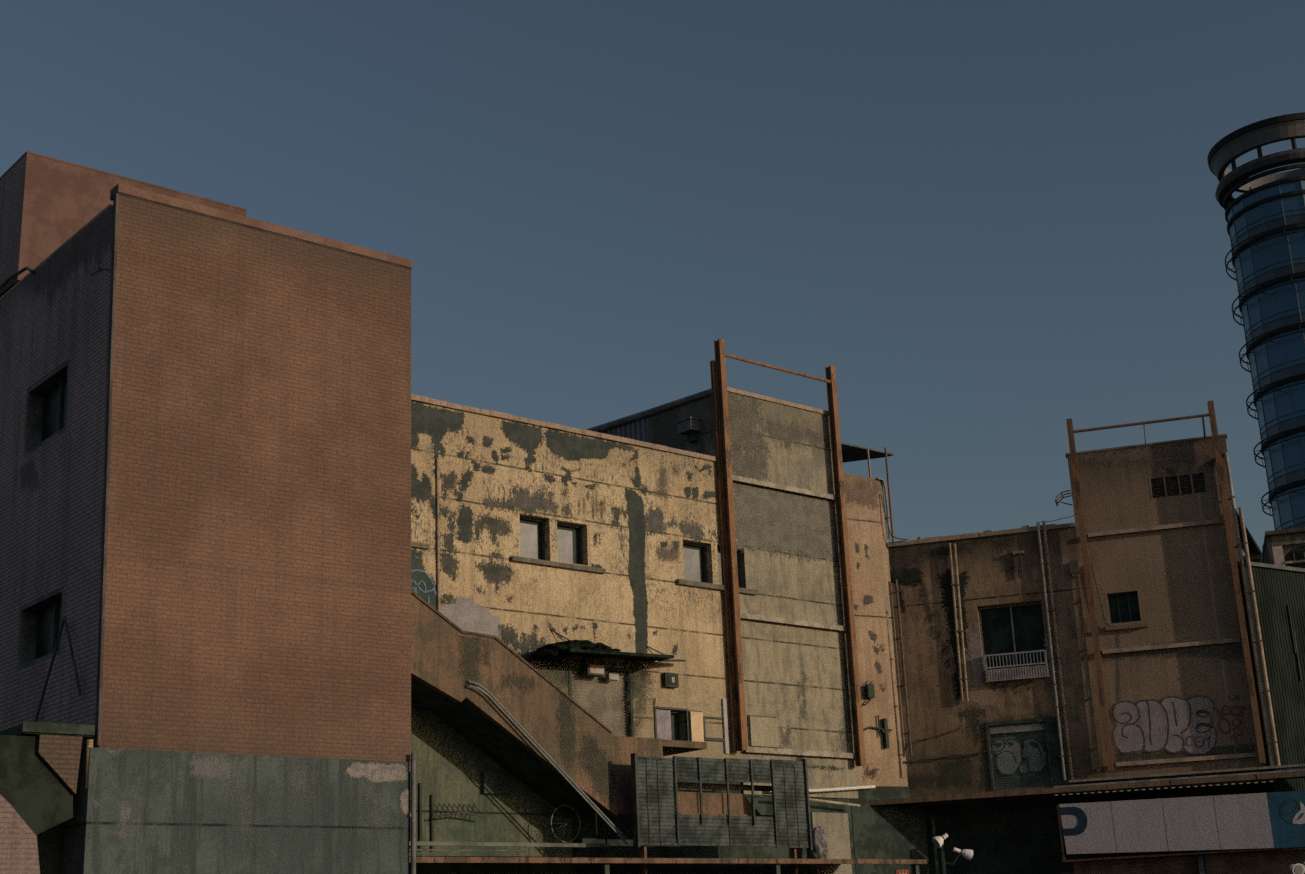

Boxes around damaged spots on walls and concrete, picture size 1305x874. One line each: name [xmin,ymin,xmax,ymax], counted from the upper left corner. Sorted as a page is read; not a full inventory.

peeling [411,401,634,607]
peeling [498,620,598,662]
water stain [889,534,1033,790]